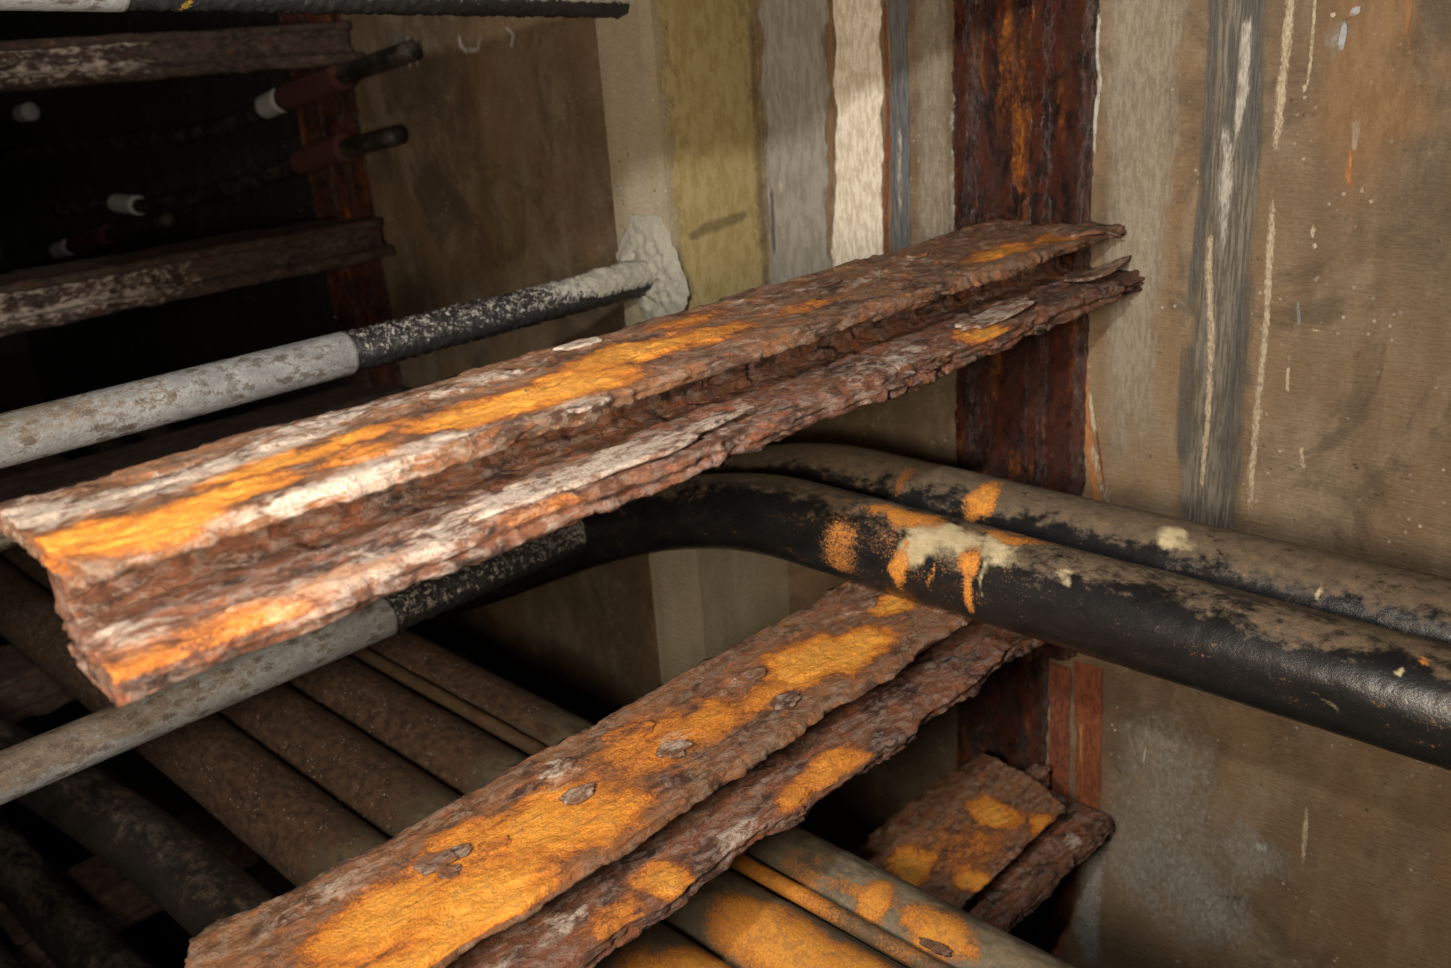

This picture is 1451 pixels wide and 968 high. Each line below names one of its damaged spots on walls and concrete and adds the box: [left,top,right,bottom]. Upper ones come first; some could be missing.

water stain [1177,0,1317,530]
corrosion [1085,364,1111,503]
corrosion [1048,661,1103,811]